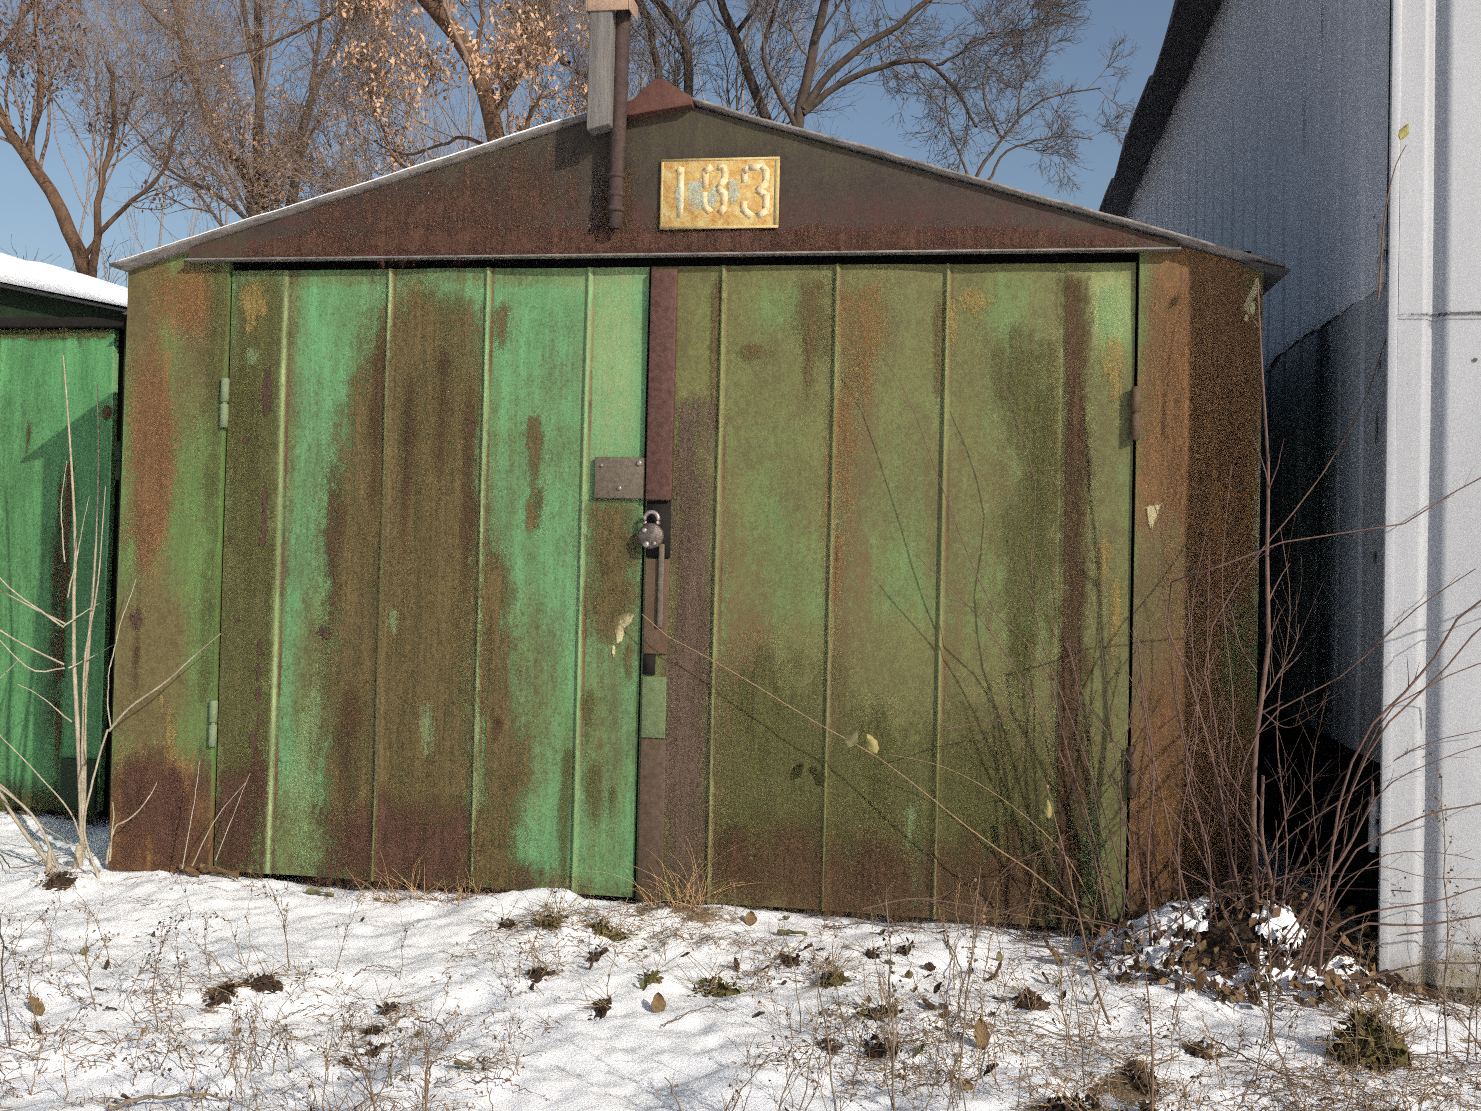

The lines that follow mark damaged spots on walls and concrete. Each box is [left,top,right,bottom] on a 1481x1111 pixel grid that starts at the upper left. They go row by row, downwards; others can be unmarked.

rust [242,154,1140,262]
peeling [1243,278,1261,322]
rust [51,463,74,806]
rust [129,606,143,680]
rust [307,291,544,894]
rust [662,276,1122,939]
rust [109,747,276,879]